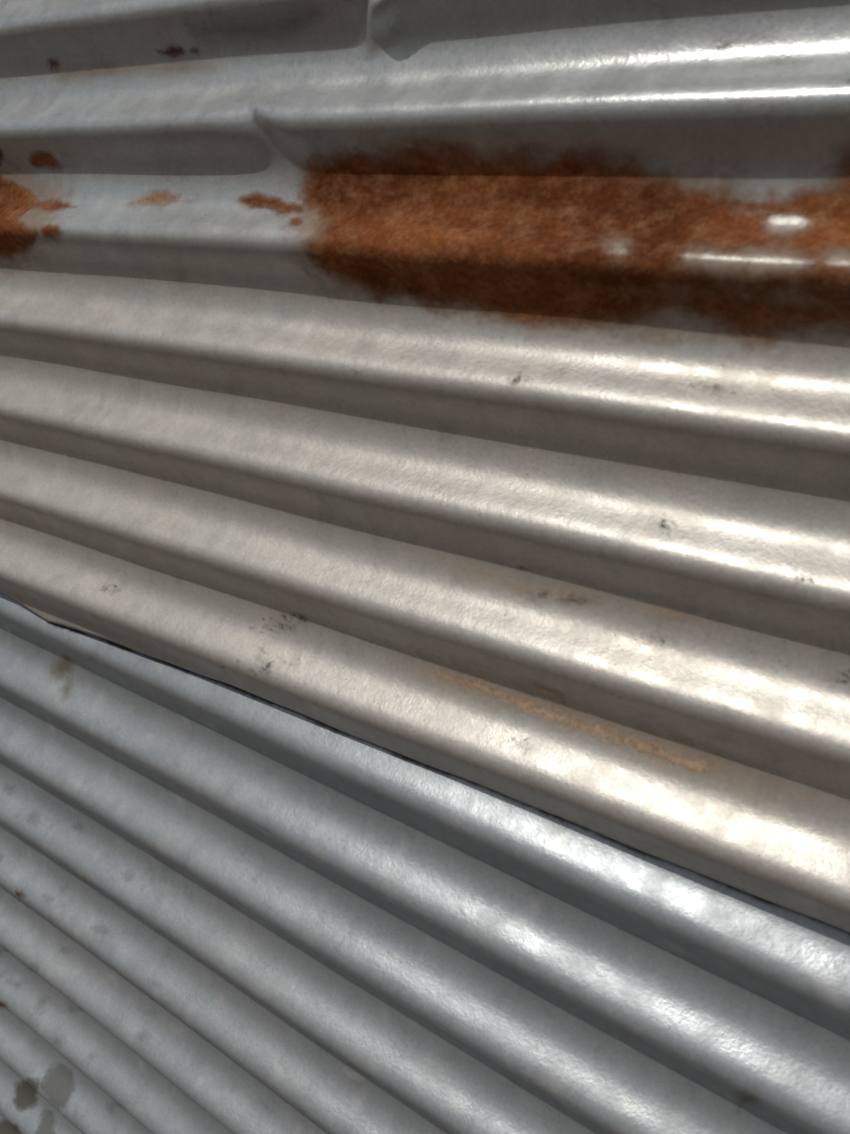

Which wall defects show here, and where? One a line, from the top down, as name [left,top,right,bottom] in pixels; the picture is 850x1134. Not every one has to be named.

rust [31,153,57,168]
rust [0,176,69,257]
rust [239,144,850,341]